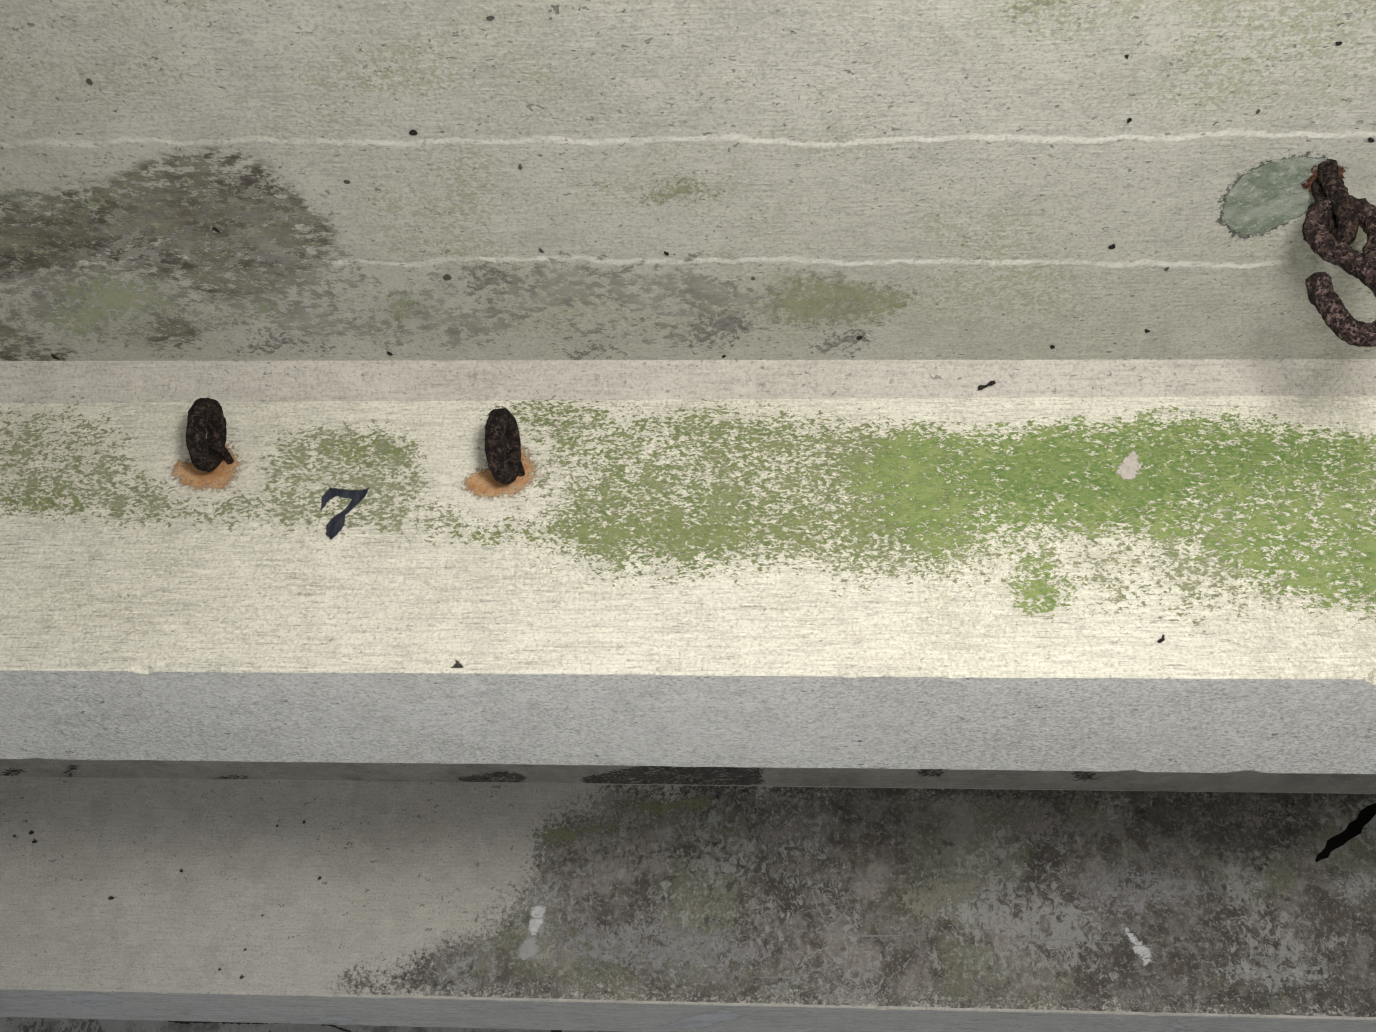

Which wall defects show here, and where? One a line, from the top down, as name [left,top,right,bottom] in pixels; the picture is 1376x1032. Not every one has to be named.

corrosion [1301,165,1318,194]
water stain [0,152,890,361]
corrosion [172,444,242,491]
corrosion [463,446,539,499]
crack [1315,803,1376,862]
water stain [334,766,1376,1032]
crack [168,1021,351,1032]
water stain [314,1016,358,1025]